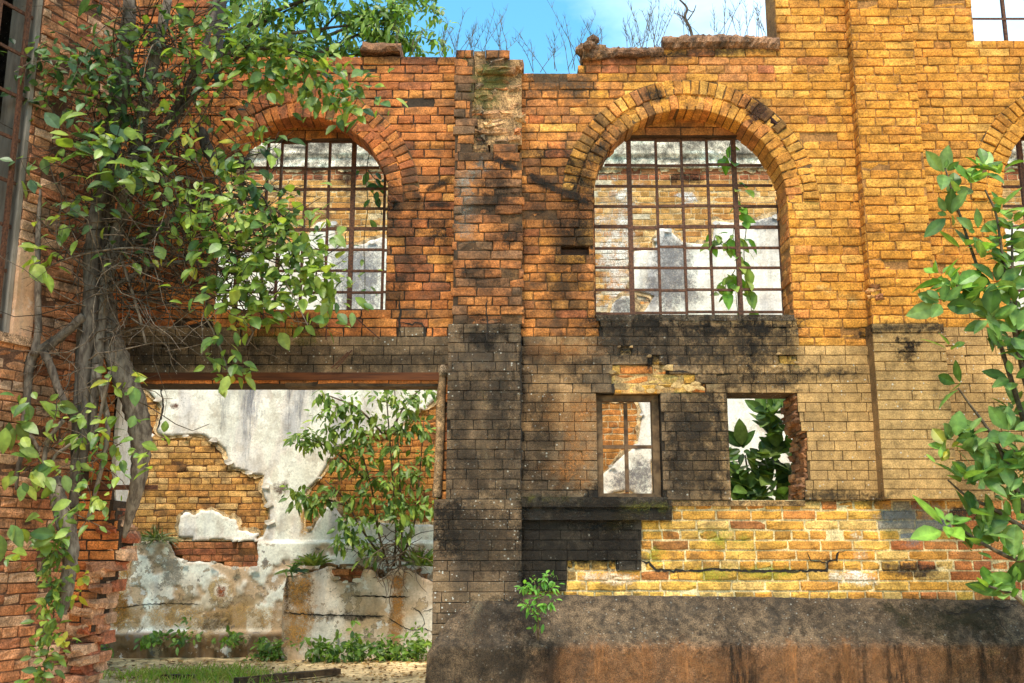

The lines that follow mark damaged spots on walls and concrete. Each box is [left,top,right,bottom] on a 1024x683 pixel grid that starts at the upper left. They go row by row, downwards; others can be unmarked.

mould [859,323,944,361]
water stain [433,189,862,683]
spalling [602,346,706,471]
flaking render [133,394,276,571]
water stain [112,562,139,627]
water stain [161,558,182,586]
water stain [149,573,406,648]
crack [637,551,844,578]